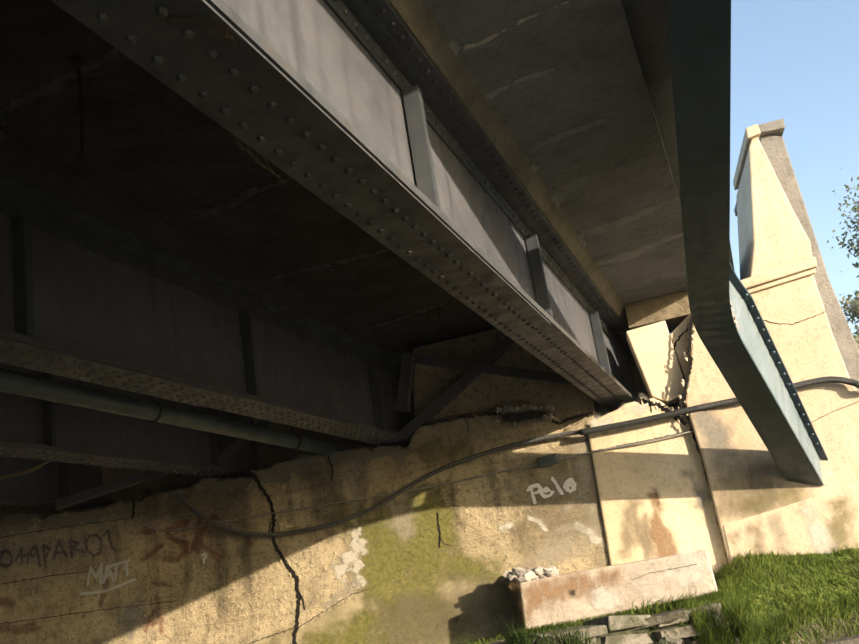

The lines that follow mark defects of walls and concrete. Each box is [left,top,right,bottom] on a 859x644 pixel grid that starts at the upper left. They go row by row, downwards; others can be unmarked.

crack [413,412,501,433]
crack [548,412,593,425]
crack [590,315,728,562]
corrosion [645,491,677,558]
crack [0,571,89,585]
crack [249,474,376,644]
water stain [323,527,367,609]
crack [0,600,177,624]